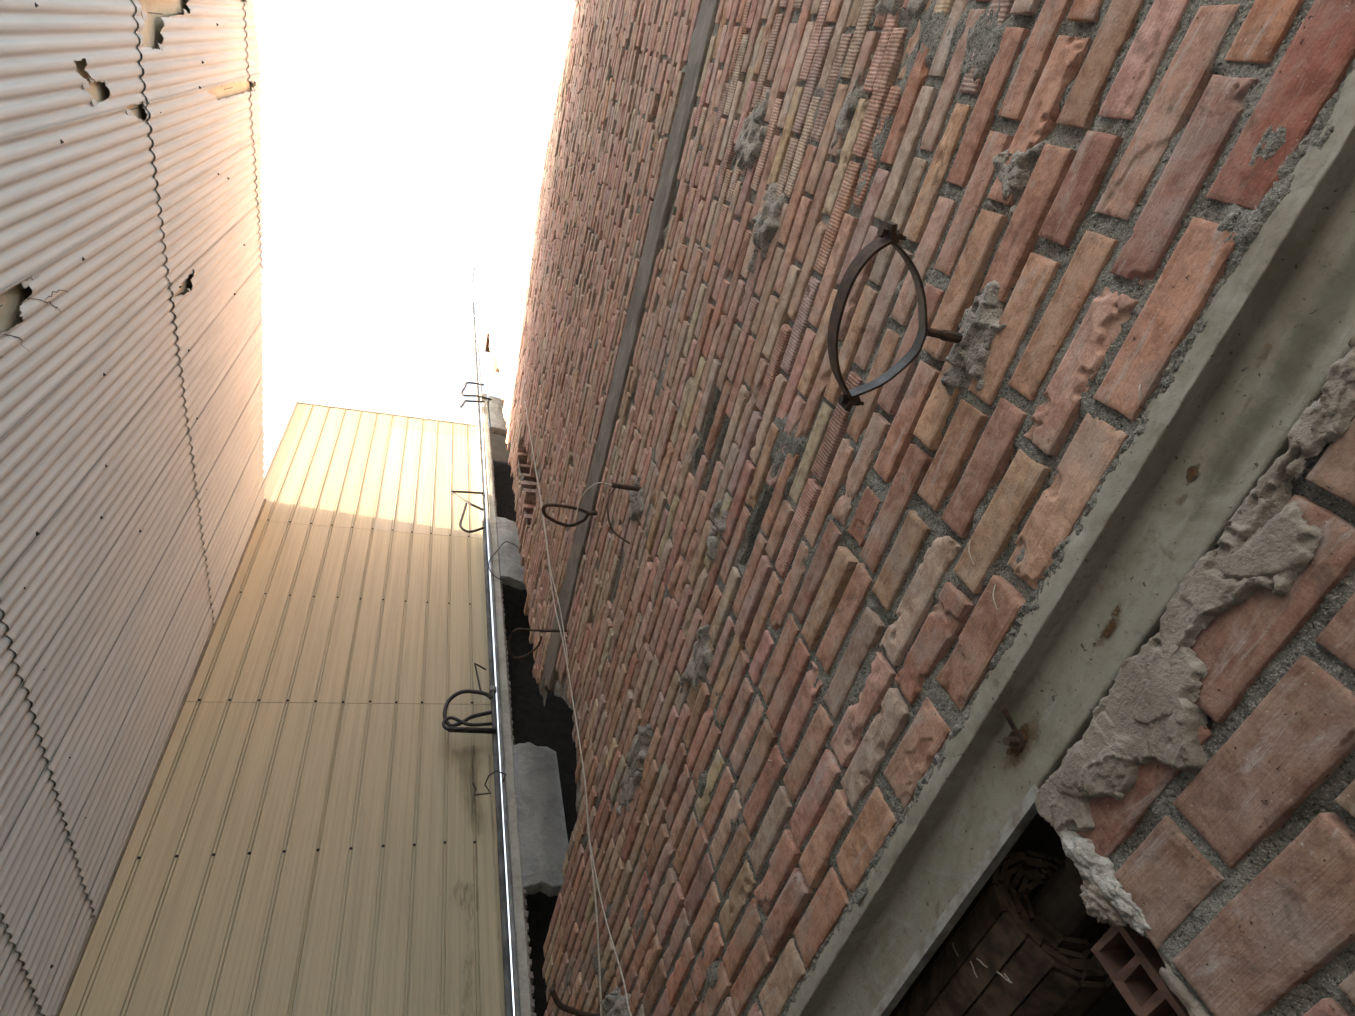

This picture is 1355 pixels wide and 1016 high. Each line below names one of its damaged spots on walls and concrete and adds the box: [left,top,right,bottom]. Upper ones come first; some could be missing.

spalling [138,0,188,50]
spalling [74,60,109,106]
spalling [126,101,148,119]
spalling [208,79,255,100]
spalling [0,273,40,332]
rust [1100,605,1120,638]
peeling [1034,334,1355,1016]